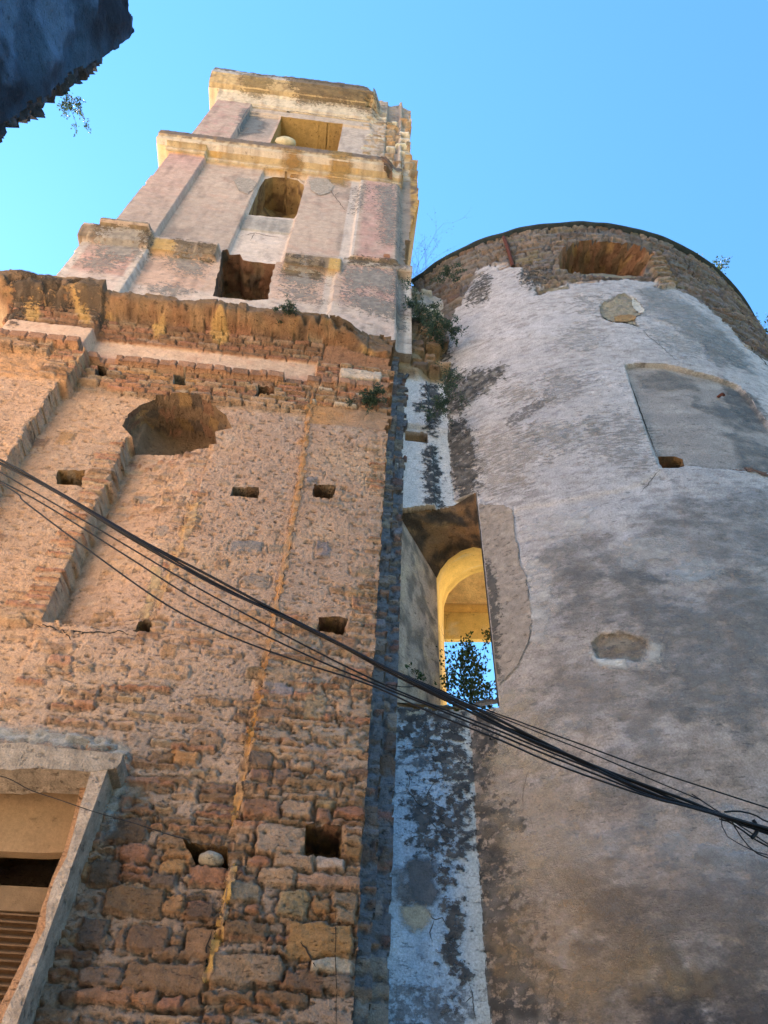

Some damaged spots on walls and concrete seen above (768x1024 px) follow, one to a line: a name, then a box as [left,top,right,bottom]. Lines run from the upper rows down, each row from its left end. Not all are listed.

flaking render [600,293,645,326]
crack [31,499,202,640]
flaking render [591,634,661,670]
damp [388,707,768,1024]